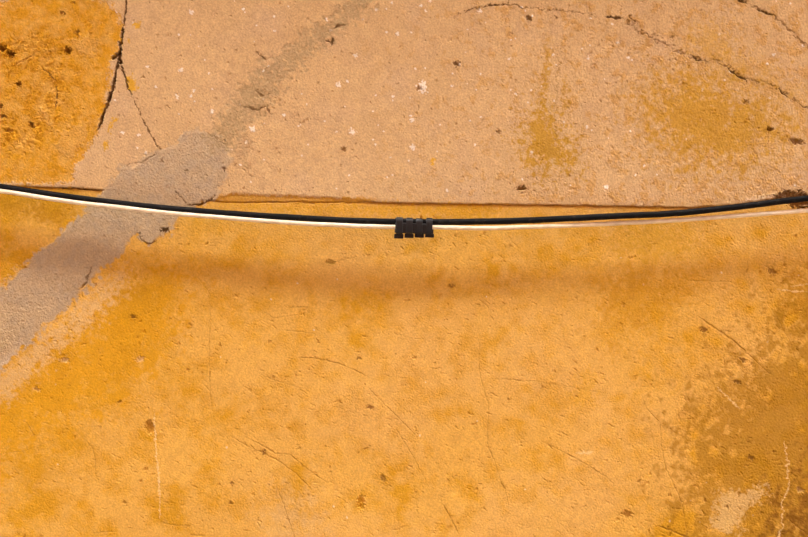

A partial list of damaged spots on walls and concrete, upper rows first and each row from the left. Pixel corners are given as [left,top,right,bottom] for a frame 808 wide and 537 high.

spalling [0,43,17,59]
crack [97,0,162,169]
crack [451,0,808,110]